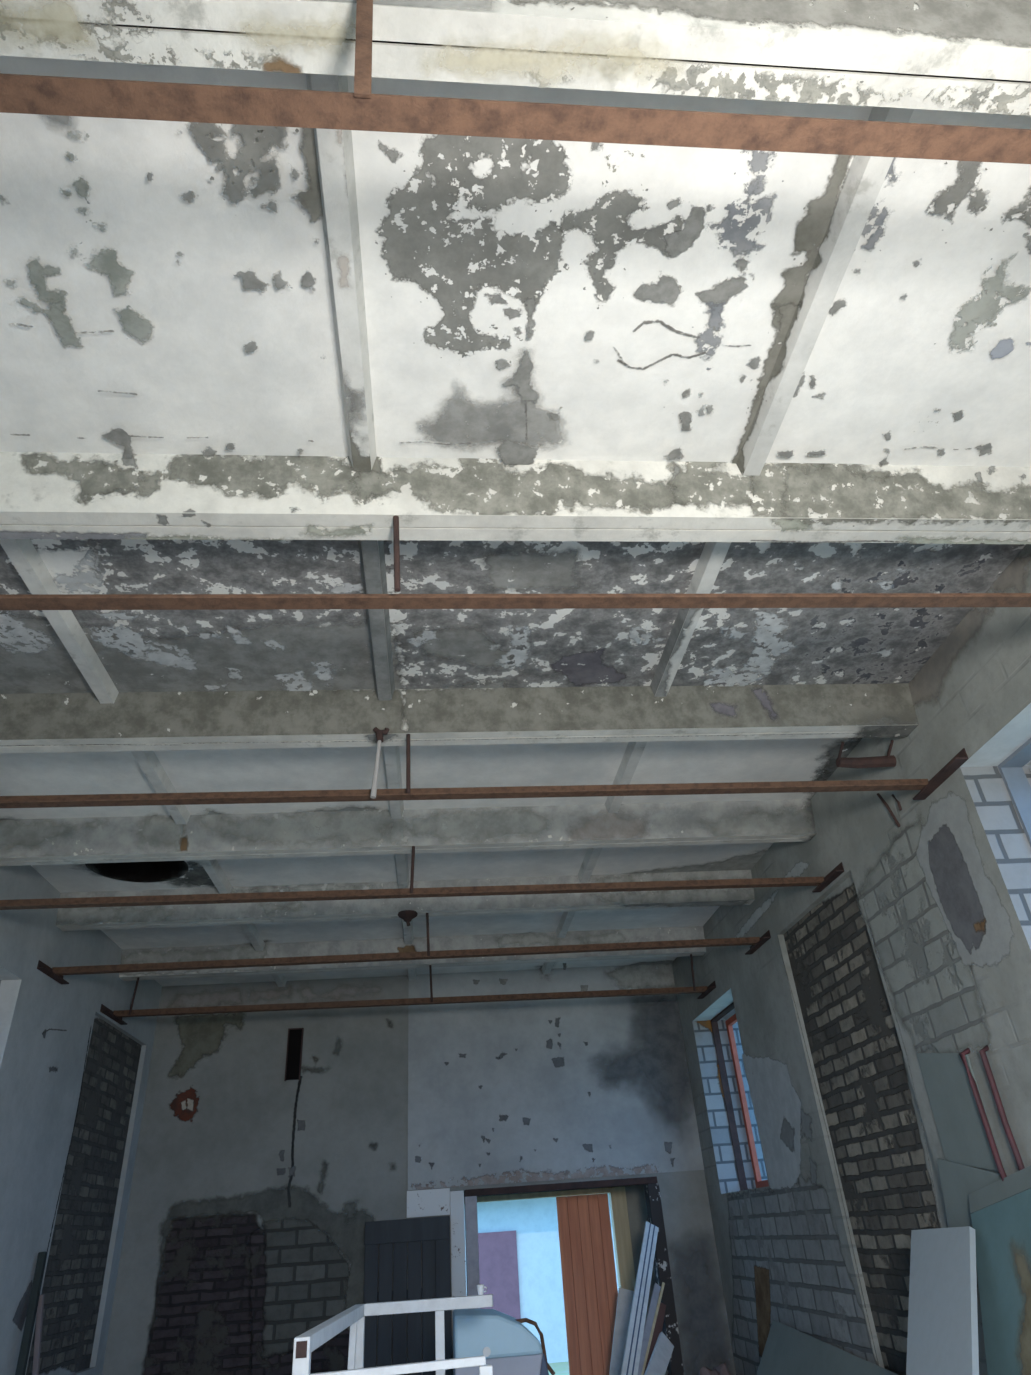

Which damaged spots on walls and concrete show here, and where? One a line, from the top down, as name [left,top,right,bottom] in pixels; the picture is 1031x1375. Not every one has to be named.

peeling [7,242,153,348]
crack [618,320,750,370]
peeling [879,433,992,467]
peeling [0,610,53,653]
peeling [89,612,197,670]
peeling [489,624,530,671]
peeling [703,611,796,687]
flaking render [916,792,1014,967]
damp [168,985,381,1078]
damp [599,960,691,1127]
flaking render [728,884,941,1375]
flaking render [142,1213,350,1375]